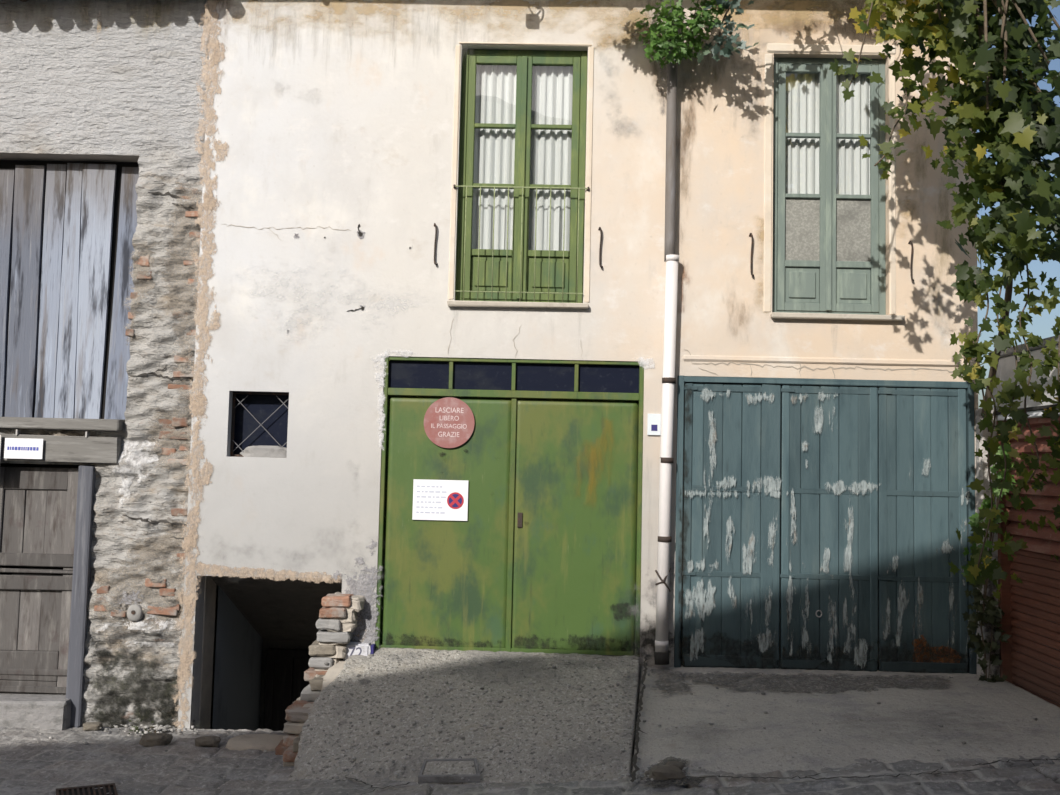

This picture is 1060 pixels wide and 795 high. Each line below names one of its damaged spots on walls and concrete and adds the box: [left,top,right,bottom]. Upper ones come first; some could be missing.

leakage [307,0,414,22]
leakage [454,0,597,27]
leakage [601,12,648,47]
leakage [718,0,851,30]
crack [148,191,197,219]
crack [129,366,188,380]
spalling [91,0,382,767]
crack [122,515,186,539]
spalling [651,388,973,695]
leakage [87,637,179,729]